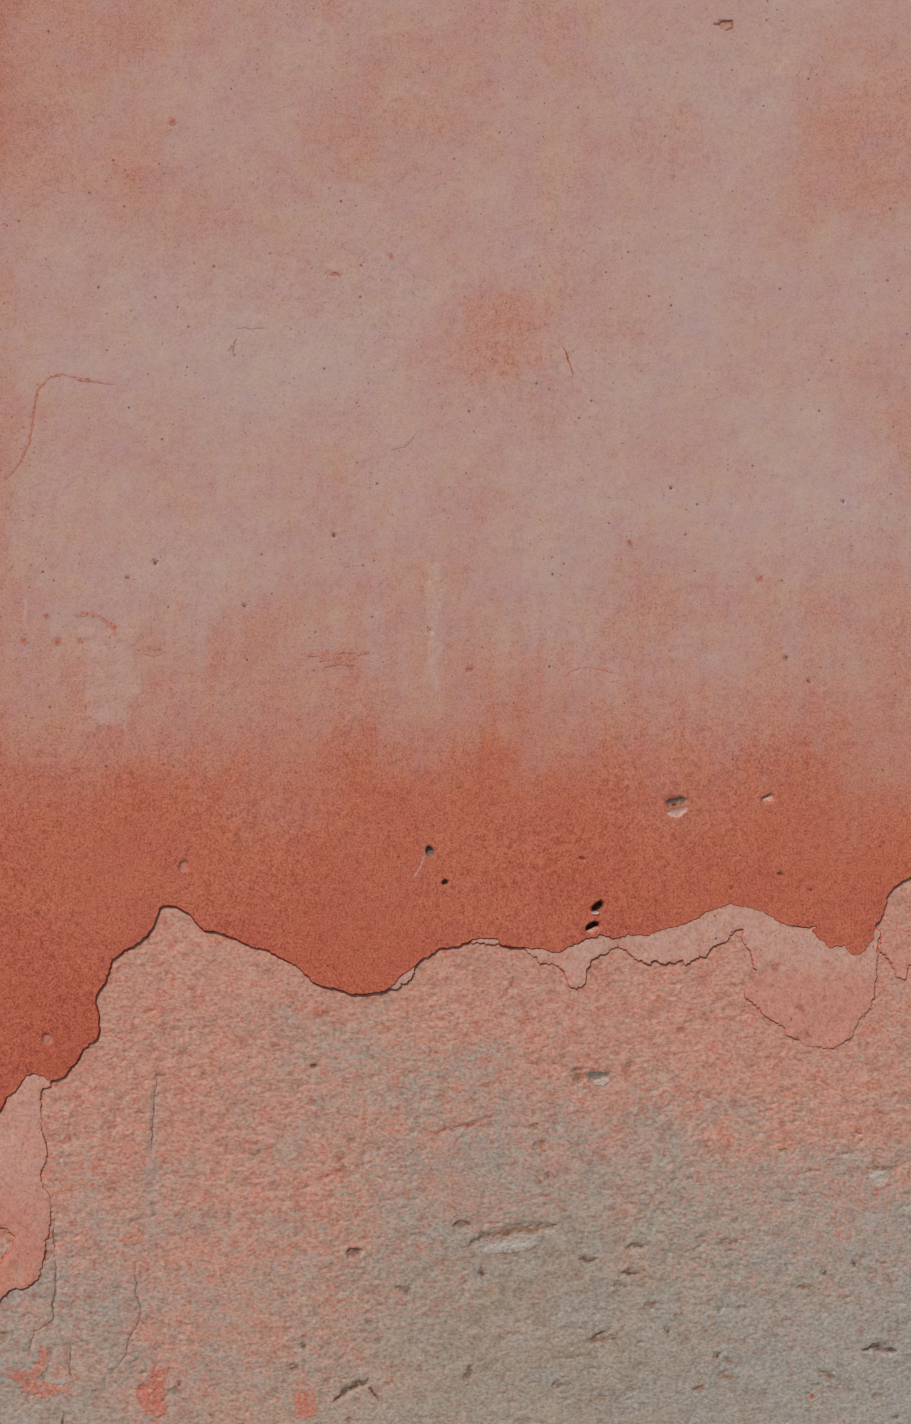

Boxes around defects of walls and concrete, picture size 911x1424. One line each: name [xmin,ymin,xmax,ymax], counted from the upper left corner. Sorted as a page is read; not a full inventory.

spalling [0,877,911,1424]